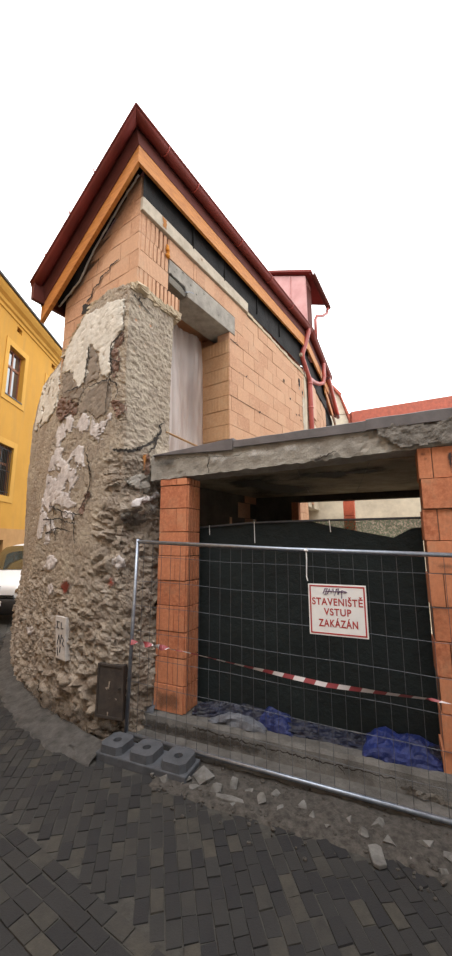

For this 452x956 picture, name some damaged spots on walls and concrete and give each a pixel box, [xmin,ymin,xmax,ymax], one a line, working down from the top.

crack [86,258,119,302]
flaking render [34,299,127,571]
crack [113,423,252,473]
spalling [378,416,452,447]
crack [43,446,91,543]
spalling [121,509,147,526]